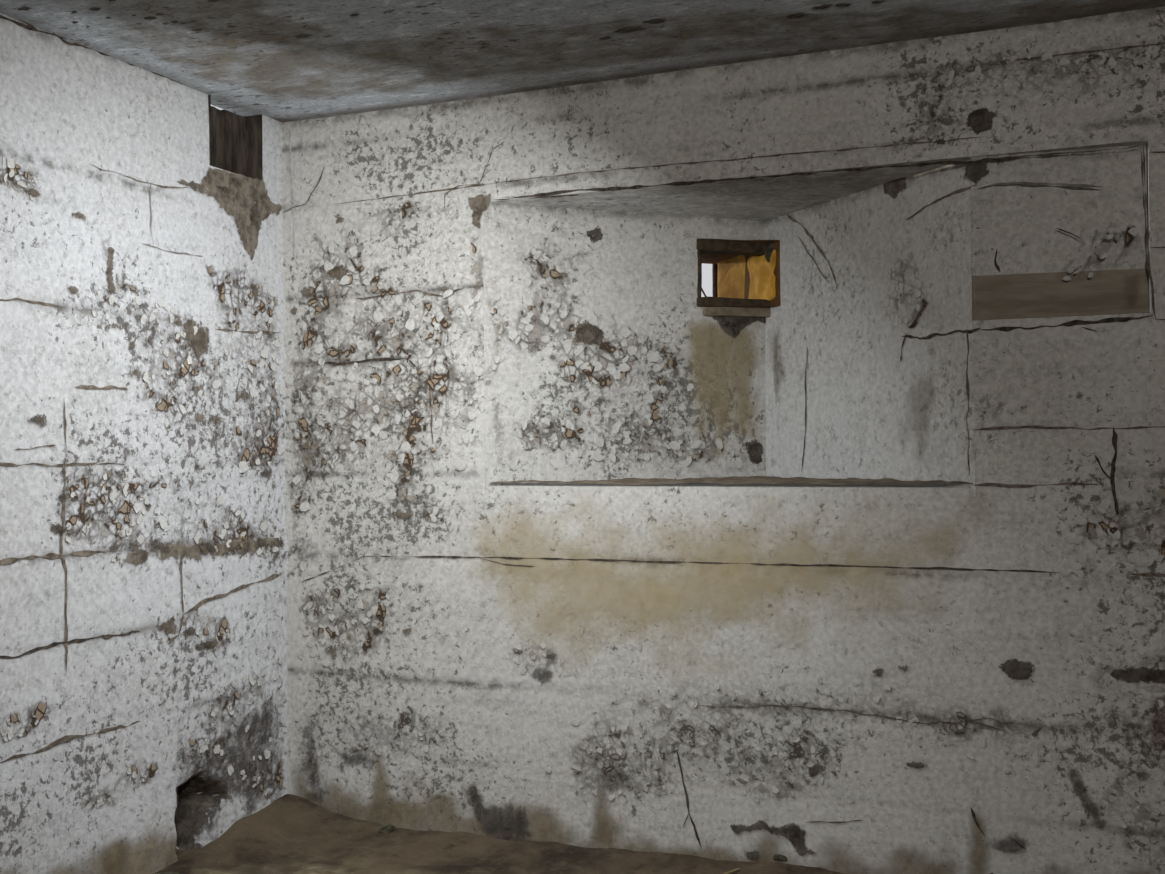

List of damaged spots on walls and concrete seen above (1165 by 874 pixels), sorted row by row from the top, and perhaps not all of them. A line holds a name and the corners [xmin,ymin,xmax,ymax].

peeling [92,167,677,522]
crack [283,136,1165,515]
flaking render [27,414,47,427]
peeling [643,412,765,470]
crack [0,385,140,672]
flaking render [51,468,303,566]
crack [169,556,1060,643]
leakage [523,539,829,622]
leakage [94,836,179,874]
leakage [179,704,274,836]
spalling [174,725,287,859]
leakage [302,727,782,864]